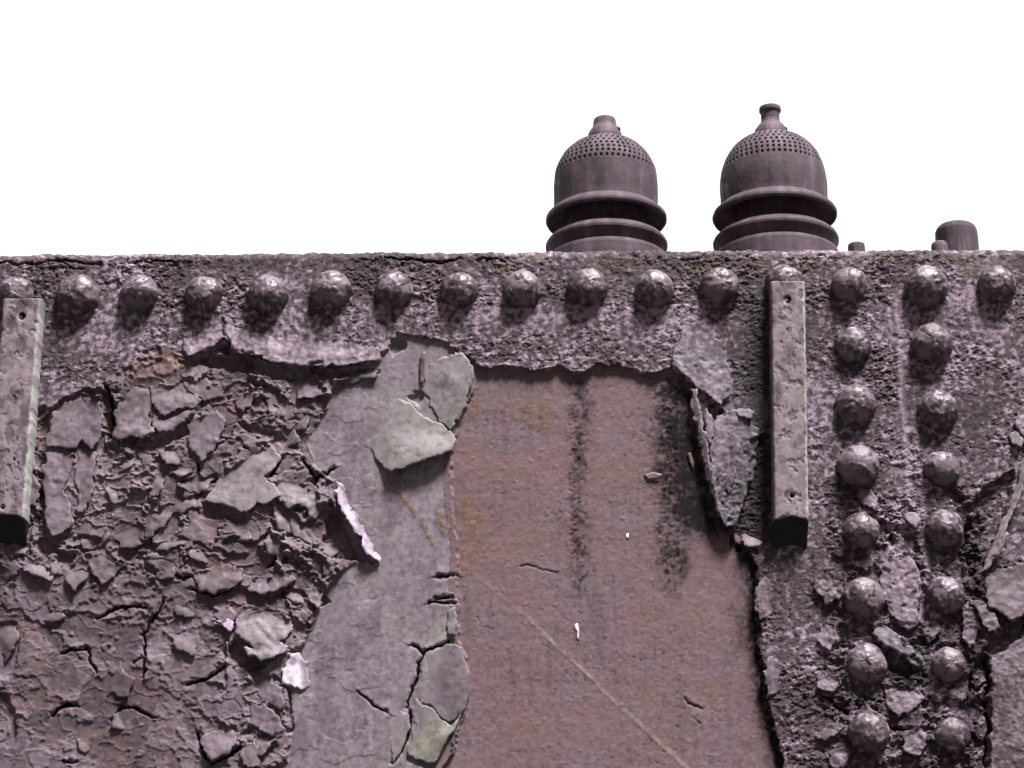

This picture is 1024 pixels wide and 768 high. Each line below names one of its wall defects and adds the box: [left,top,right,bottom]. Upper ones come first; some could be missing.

peeling [182,320,381,400]
peeling [370,351,474,472]
damp [653,383,718,538]
peeling [671,325,763,548]
crack [97,599,164,678]
peeling [0,378,341,768]
crack [197,733,243,764]
crack [358,639,451,763]
crack [427,574,455,604]
corrosion [392,361,781,768]
damp [658,529,687,583]
peeling [813,545,941,768]